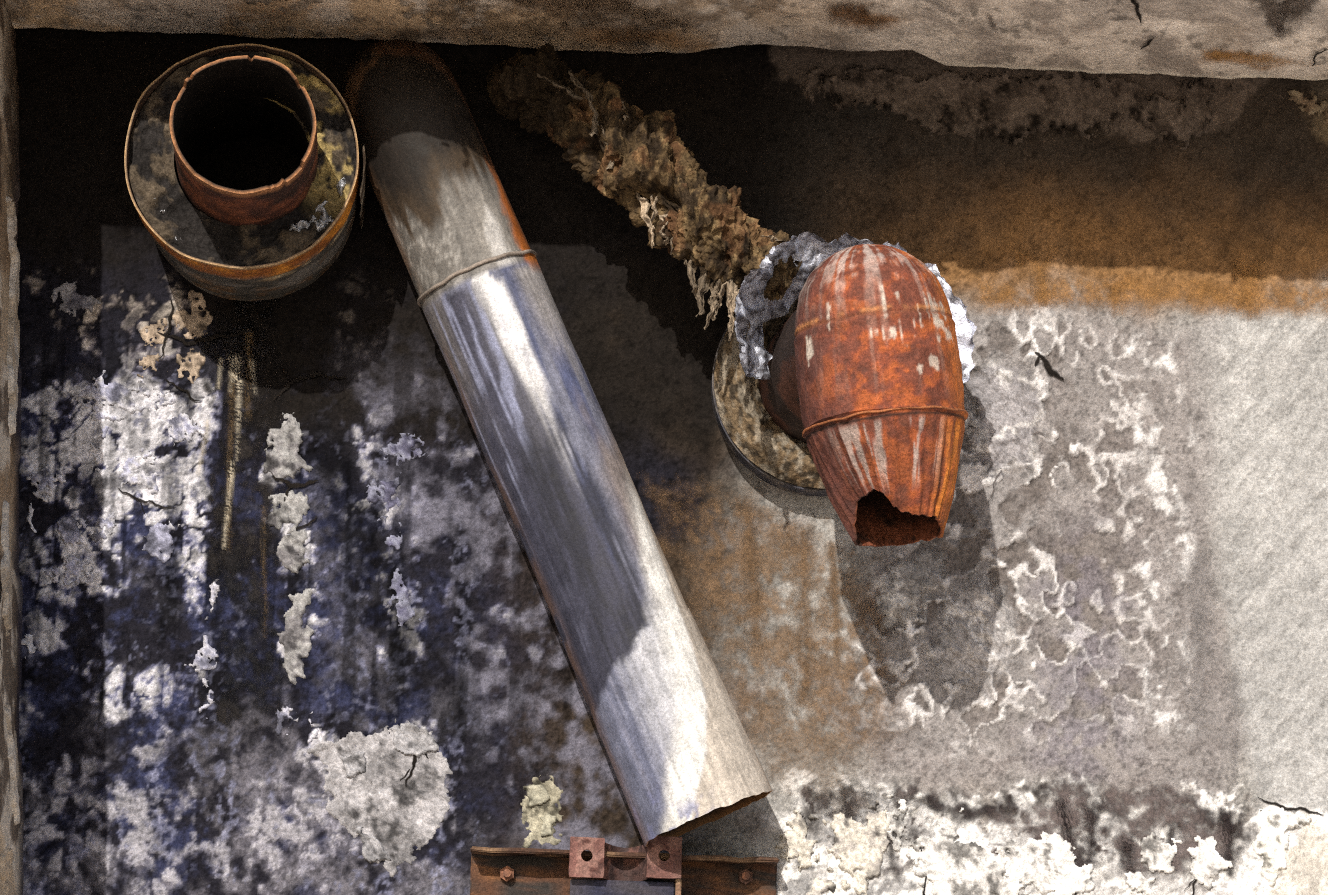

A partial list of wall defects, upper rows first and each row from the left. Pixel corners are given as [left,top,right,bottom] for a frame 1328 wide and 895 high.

crack [1131,0,1154,49]
damp [1249,0,1317,33]
damp [201,300,284,725]
peeling [1251,808,1312,886]